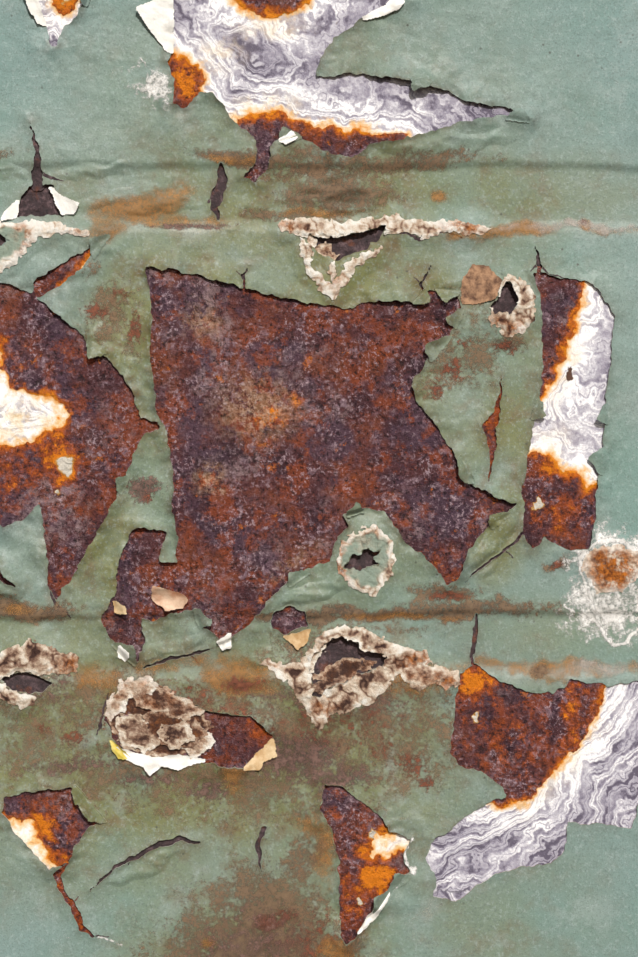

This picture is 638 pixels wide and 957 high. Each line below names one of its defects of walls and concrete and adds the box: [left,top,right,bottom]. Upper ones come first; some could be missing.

peeling [136,0,530,182]
rust [0,594,84,625]
peeling [0,234,615,776]
rust [276,582,562,665]
rust [543,556,573,571]
water stain [559,521,638,647]
peeling [2,784,107,869]
crack [53,835,201,938]
rust [0,650,455,957]
crack [255,826,267,872]
peeling [320,785,410,944]
peeling [426,656,638,901]